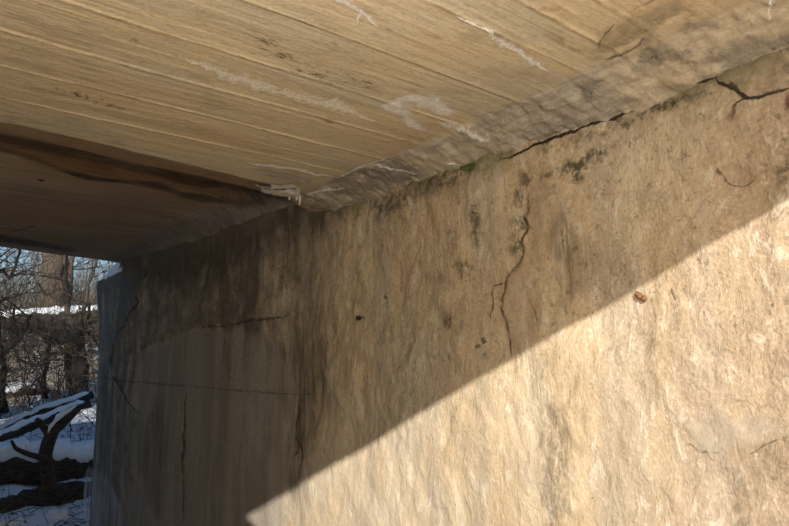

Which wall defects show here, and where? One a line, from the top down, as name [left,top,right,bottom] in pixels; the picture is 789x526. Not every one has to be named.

leakage [335,0,381,29]
leakage [457,16,550,73]
leakage [174,51,381,123]
leakage [380,95,497,145]
crack [497,111,634,161]
leakage [67,165,271,203]
leakage [242,156,415,182]
crack [490,202,532,352]
crack [180,398,188,509]